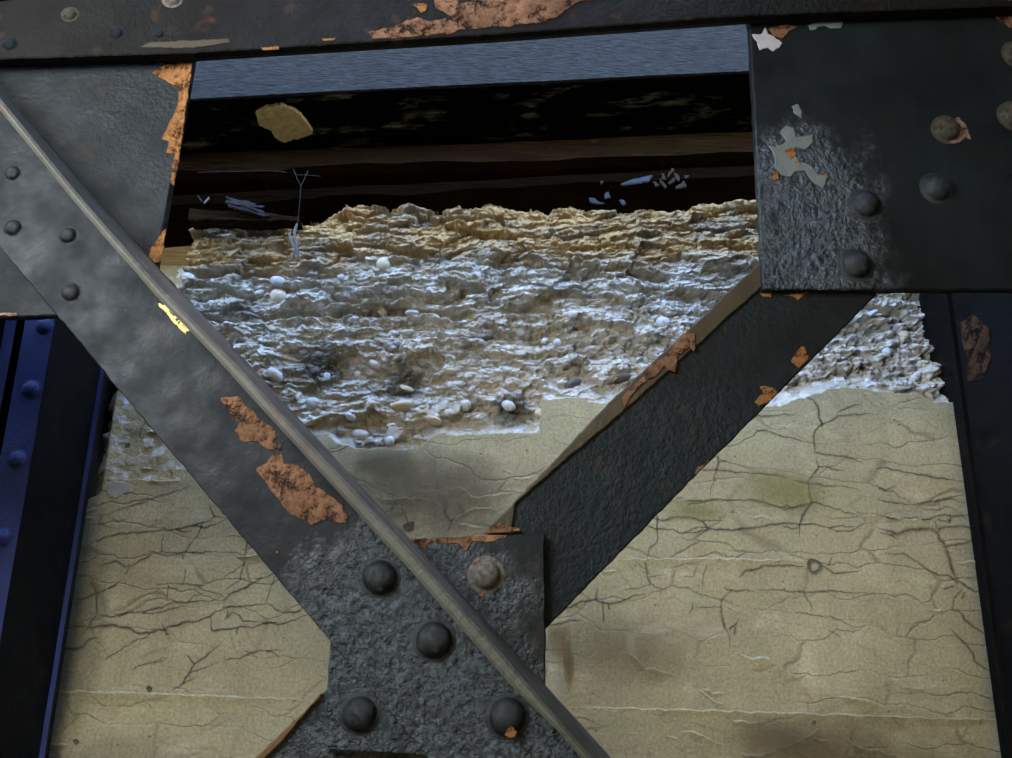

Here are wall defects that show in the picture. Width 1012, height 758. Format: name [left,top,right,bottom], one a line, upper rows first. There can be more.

corrosion [369,0,592,39]
corrosion [994,14,1012,28]
corrosion [152,62,193,186]
peeling [769,125,827,188]
spalling [177,199,759,450]
spalling [766,293,949,406]
corrosion [221,396,349,525]
crack [65,487,320,690]
crack [551,397,988,670]